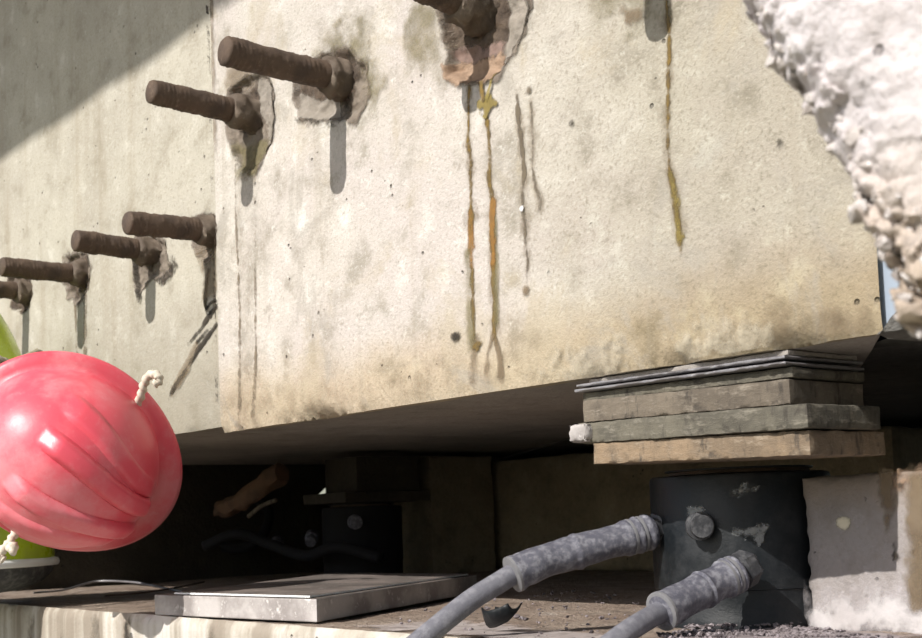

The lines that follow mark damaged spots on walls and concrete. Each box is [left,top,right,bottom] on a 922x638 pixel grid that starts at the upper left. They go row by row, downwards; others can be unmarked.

spalling [225,68,275,177]
spalling [292,22,377,125]
spalling [410,0,532,86]
spalling [625,8,642,23]
rust [465,73,504,379]
rust [666,135,684,246]
crack [169,258,218,395]
damp [809,469,922,634]